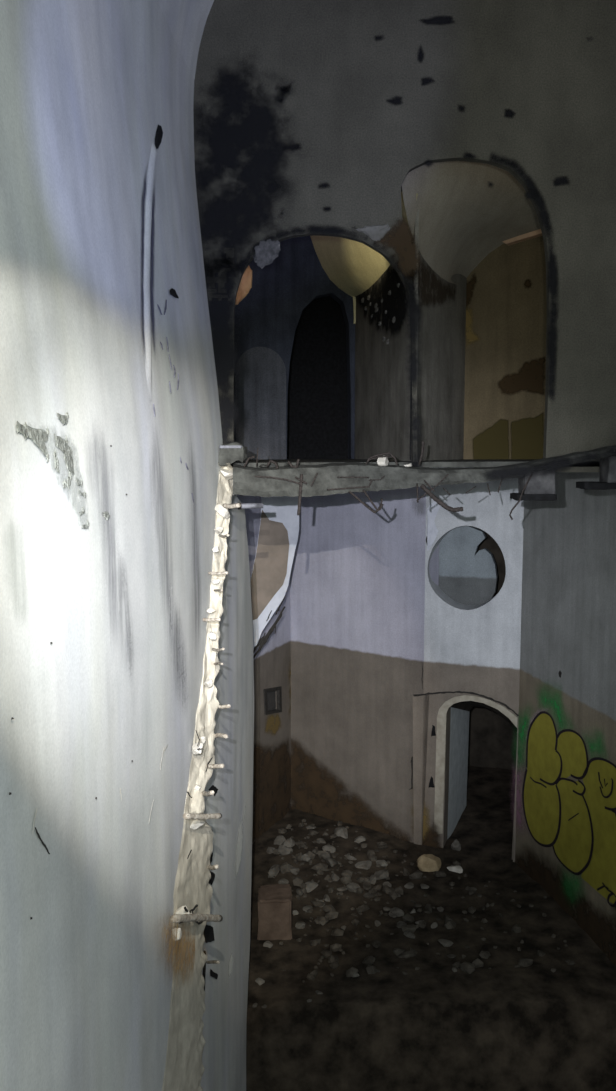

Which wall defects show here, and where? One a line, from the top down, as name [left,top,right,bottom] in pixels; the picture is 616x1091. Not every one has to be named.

peeling [16,412,89,529]
spalling [162,463,241,1091]